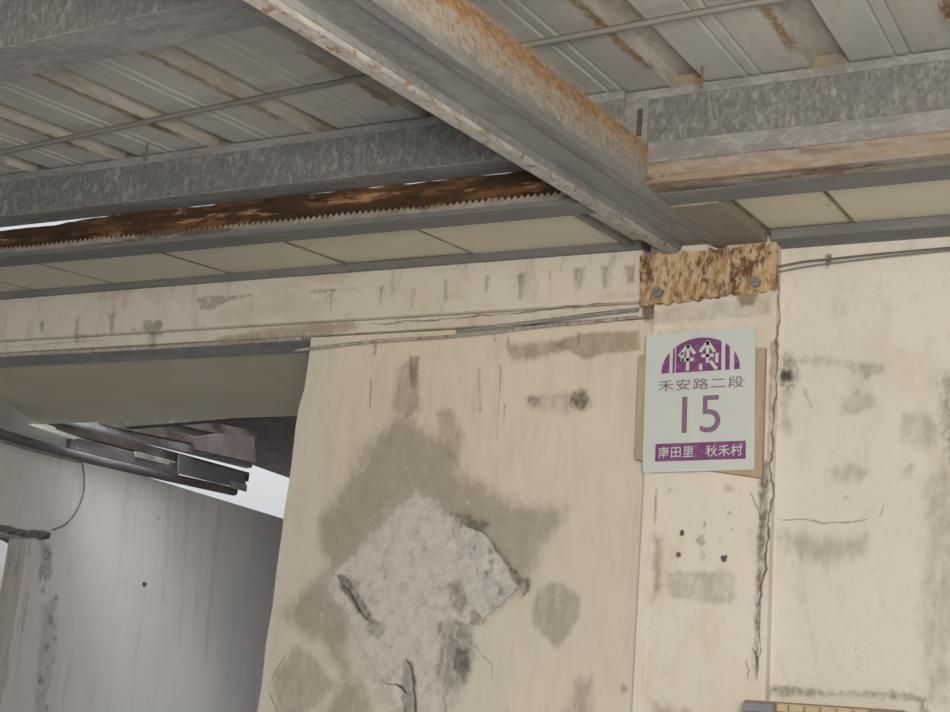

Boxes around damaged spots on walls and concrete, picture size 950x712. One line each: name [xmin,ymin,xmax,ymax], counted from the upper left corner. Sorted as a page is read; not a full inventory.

rust [35,74,172,134]
rust [147,56,277,118]
rust [394,0,950,193]
crack [754,283,781,675]
spalling [0,525,51,540]
damp [339,575,371,620]